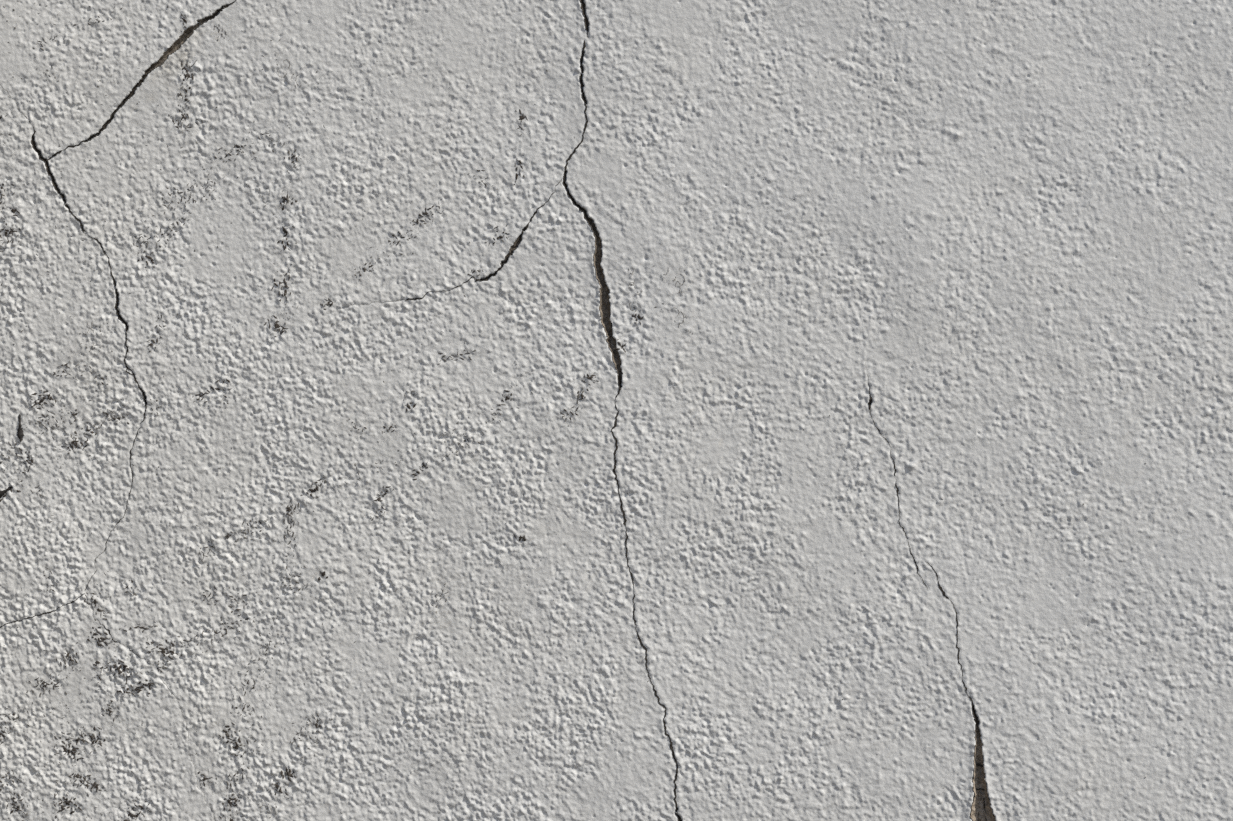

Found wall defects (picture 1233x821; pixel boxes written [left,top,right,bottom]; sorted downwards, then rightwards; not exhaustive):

crack [0,0,236,815]
crack [339,0,682,821]
crack [865,362,995,821]